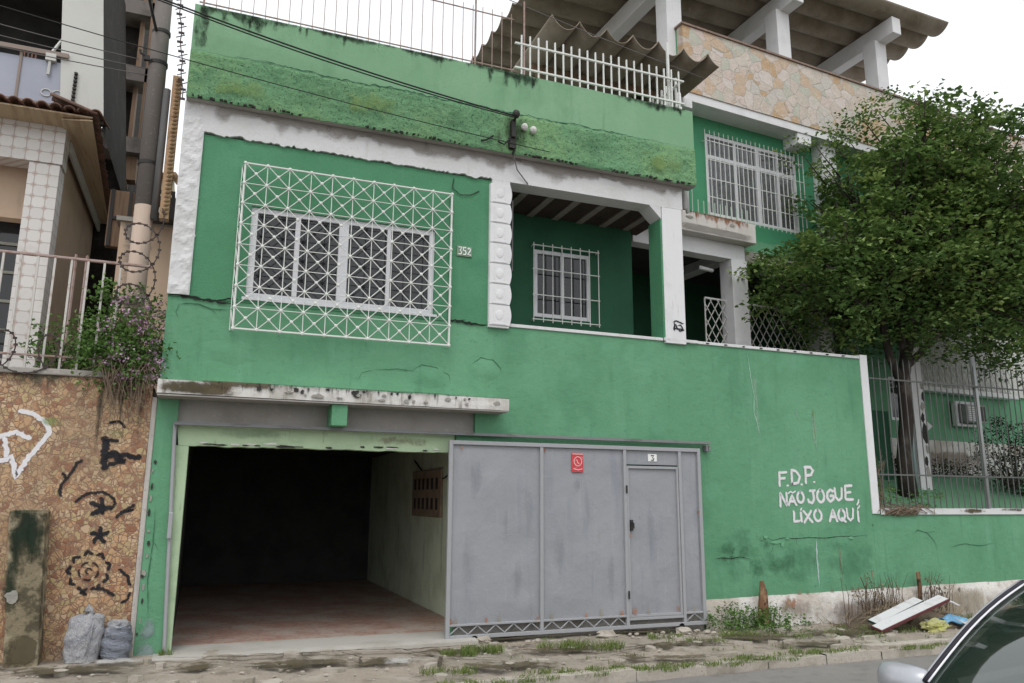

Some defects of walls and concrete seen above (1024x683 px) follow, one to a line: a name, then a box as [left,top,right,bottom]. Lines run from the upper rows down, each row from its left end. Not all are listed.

water stain [299,27,452,61]
water stain [469,63,537,85]
water stain [626,97,681,114]
corrosion [695,212,748,226]
crack [170,294,238,316]
peeling [256,386,365,399]
water stain [2,510,43,602]
crack [716,535,861,559]